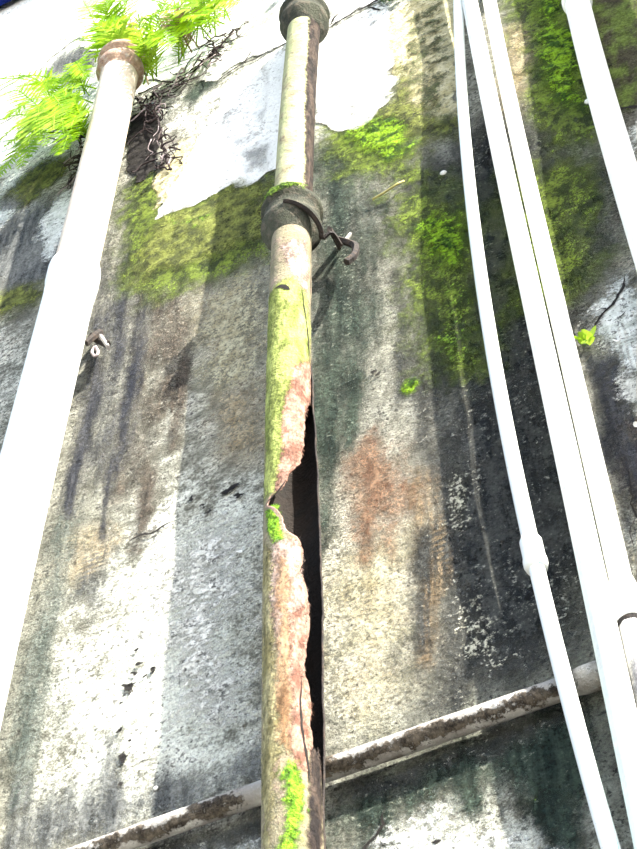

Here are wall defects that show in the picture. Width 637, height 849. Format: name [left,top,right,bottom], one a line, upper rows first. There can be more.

peeling [0,0,286,220]
crack [329,0,384,25]
peeling [315,0,458,131]
water stain [0,161,267,849]
corrosion [346,428,424,562]
water stain [311,139,551,723]
water stain [471,117,586,651]
water stain [518,94,637,529]
crack [584,272,628,340]
crack [624,461,637,549]
crack [363,804,385,849]
water stain [325,704,585,849]